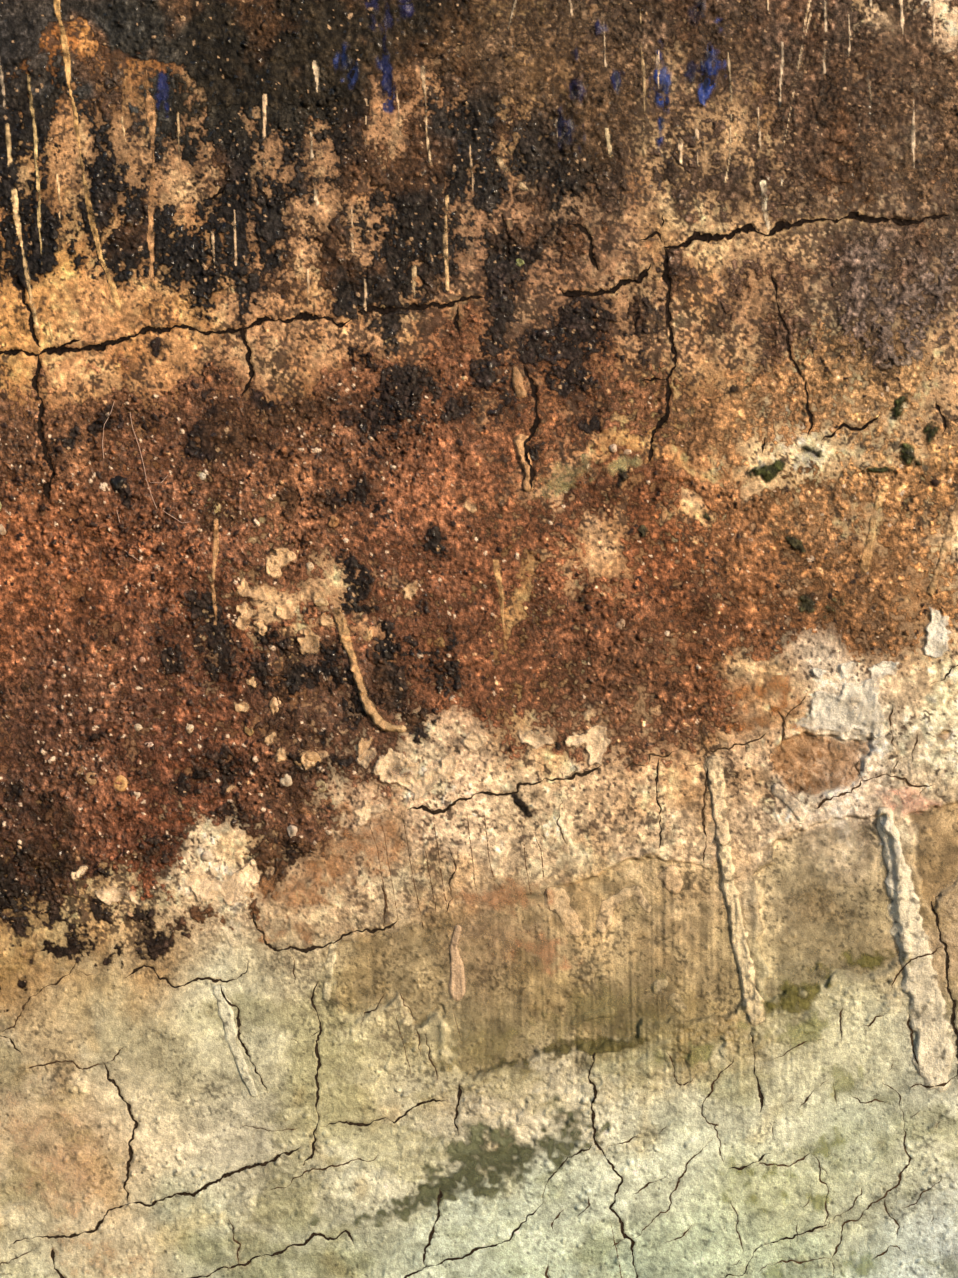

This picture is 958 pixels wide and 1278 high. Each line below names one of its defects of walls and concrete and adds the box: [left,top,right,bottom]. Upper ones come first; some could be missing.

crack [0,271,485,502]
damp [0,0,958,464]
crack [559,211,948,466]
damp [748,460,786,483]
damp [868,420,939,473]
corrosion [0,299,958,912]
damp [511,793,532,818]
crack [407,696,806,863]
spalling [771,661,899,794]
crack [0,885,462,1278]
damp [354,1097,610,1227]
crack [404,894,958,1278]